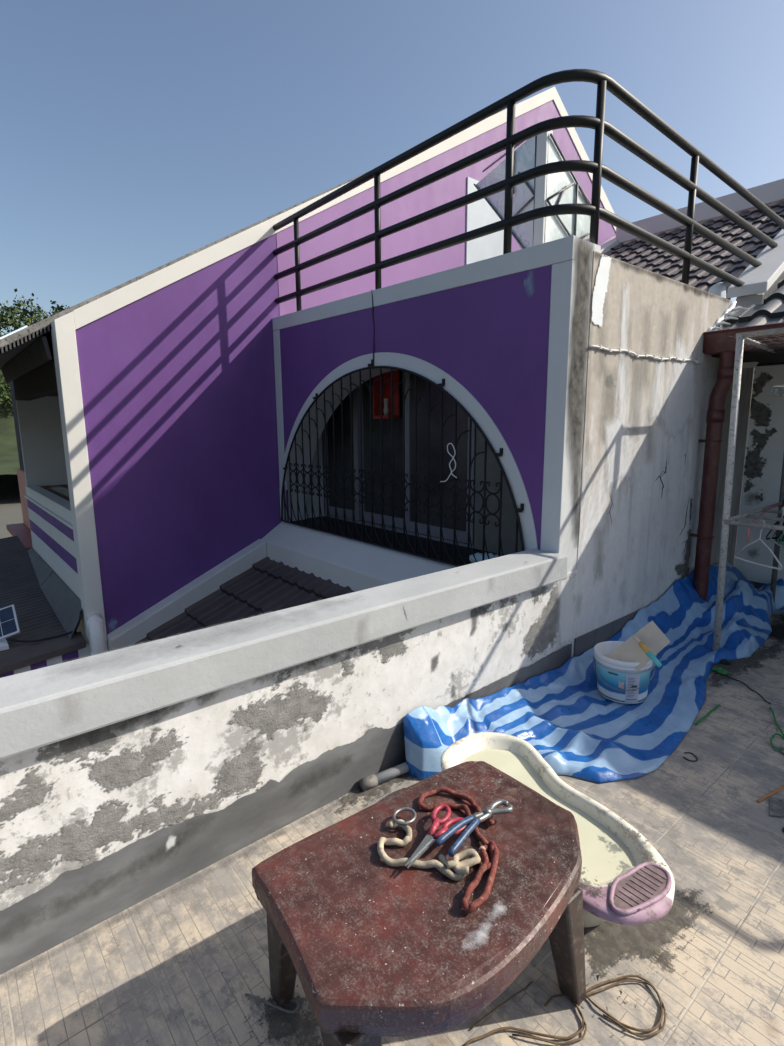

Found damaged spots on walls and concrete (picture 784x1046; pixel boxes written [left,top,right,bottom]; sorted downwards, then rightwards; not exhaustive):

leakage [568,236,604,542]
leakage [606,289,632,488]
crack [655,450,688,498]
peeling [338,628,415,677]
peeling [470,577,568,661]
peeling [0,669,333,897]